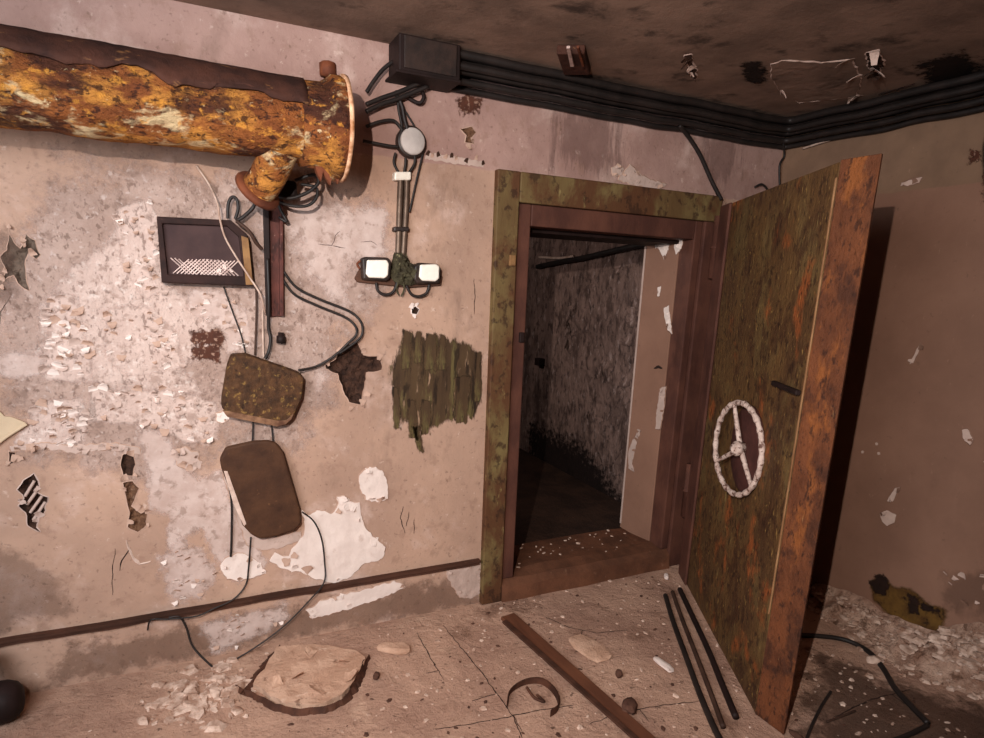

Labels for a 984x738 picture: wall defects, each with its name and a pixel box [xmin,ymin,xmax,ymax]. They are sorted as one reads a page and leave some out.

damp [740,61,769,86]
peeling [770,49,886,104]
damp [915,49,984,84]
peeling [187,290,255,352]
peeling [0,199,230,533]
spalling [325,342,384,411]
damp [390,329,482,453]
peeling [158,466,406,619]
damp [869,574,946,631]